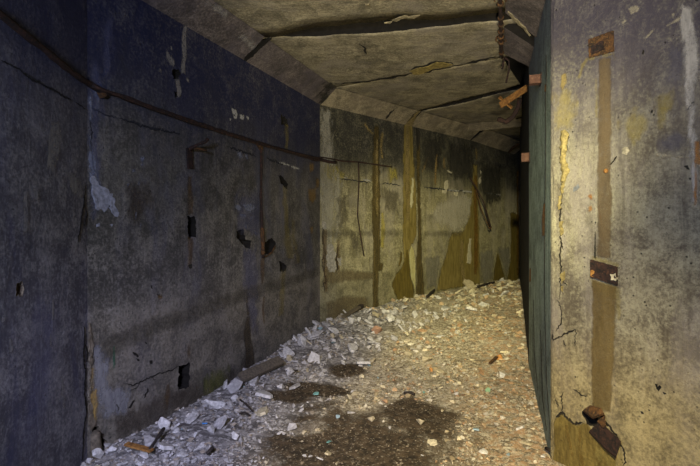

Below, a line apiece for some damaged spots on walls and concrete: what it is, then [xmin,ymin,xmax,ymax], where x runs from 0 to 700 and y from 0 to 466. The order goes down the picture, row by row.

crack [335,57,497,85]
peeling [88,151,119,226]
water stain [321,112,385,318]
water stain [392,111,519,300]
hole [236,229,251,249]
hole [265,238,276,255]
crack [533,64,586,440]
crack [126,366,179,390]
hole [177,362,190,390]
spalling [553,411,616,466]
crack [606,422,627,466]